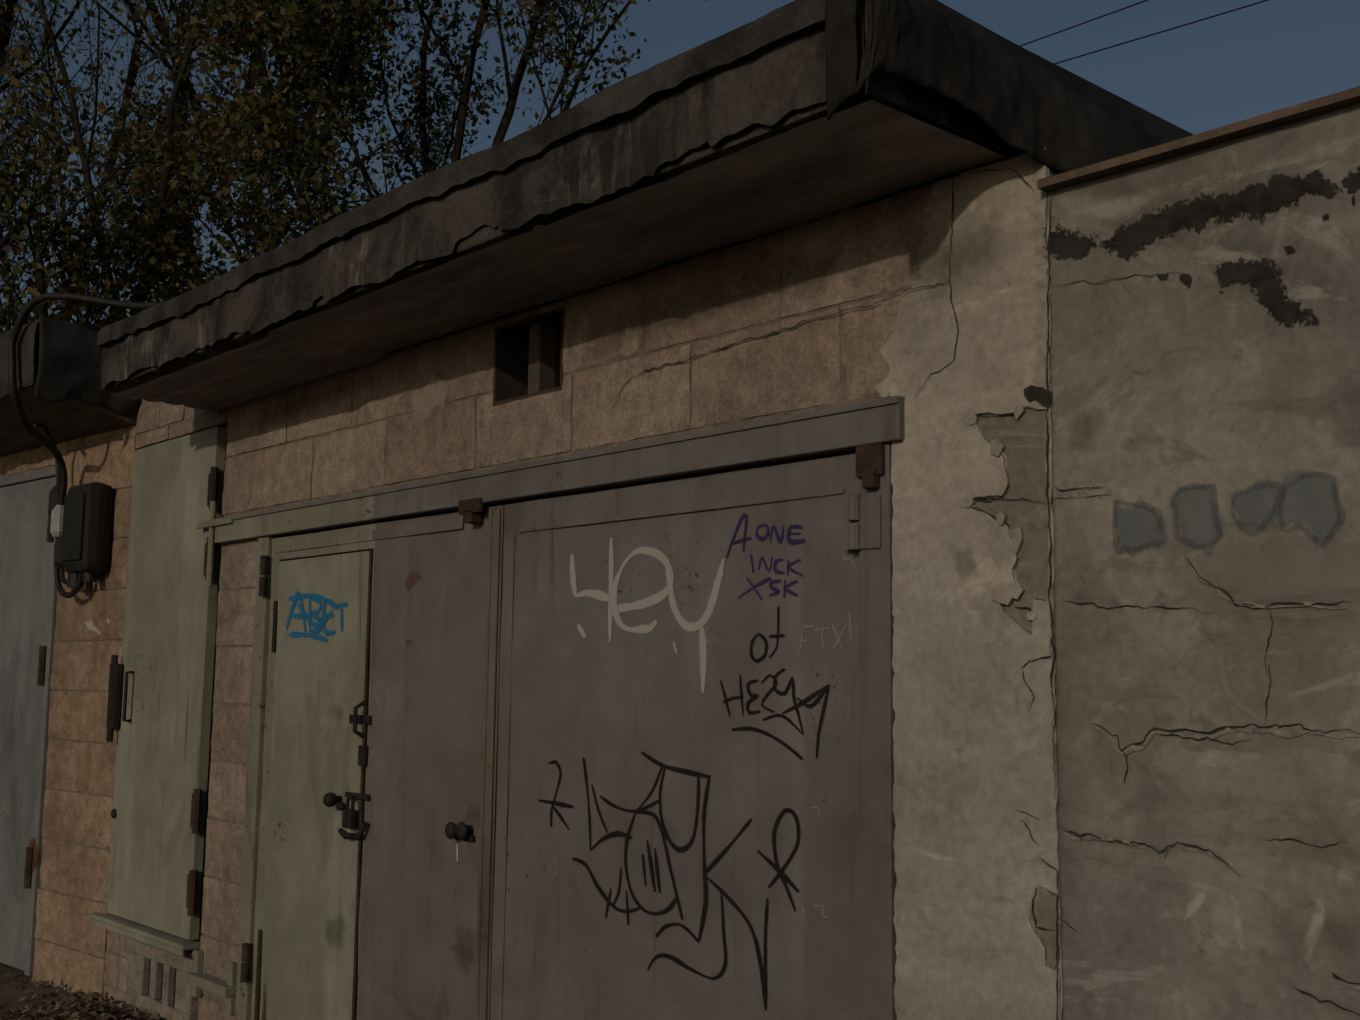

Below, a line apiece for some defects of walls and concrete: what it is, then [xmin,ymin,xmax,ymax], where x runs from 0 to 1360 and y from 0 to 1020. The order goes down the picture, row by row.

leakage [1070,196,1146,218]
crack [615,168,1360,1020]
spalling [960,385,1111,633]
spalling [1029,887,1061,970]